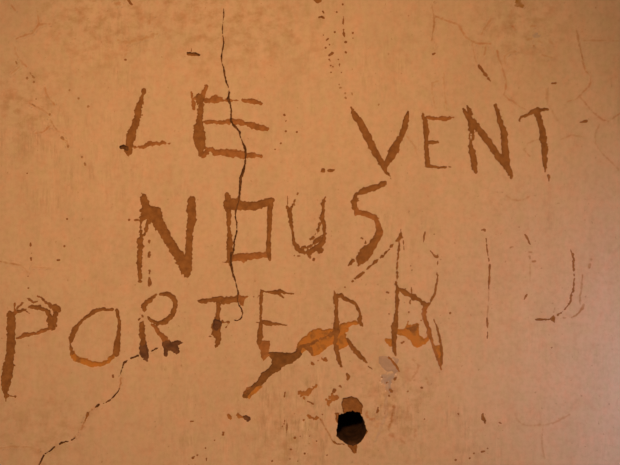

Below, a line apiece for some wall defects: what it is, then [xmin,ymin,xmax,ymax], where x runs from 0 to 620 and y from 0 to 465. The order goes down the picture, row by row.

crack [221,8,247,321]
crack [39,348,158,465]
peeling [242,328,349,399]
spalling [298,384,318,405]
spalling [325,373,350,406]
spalling [332,407,379,446]